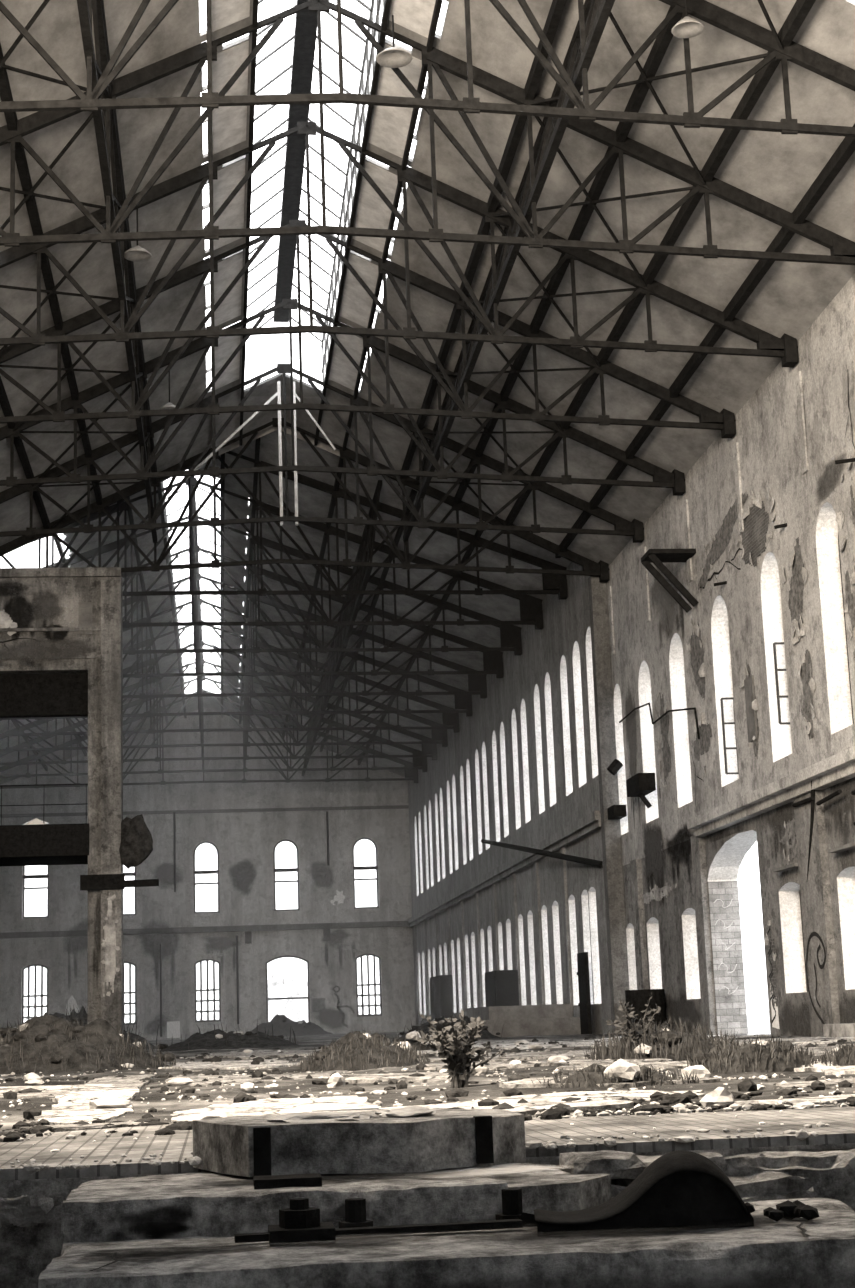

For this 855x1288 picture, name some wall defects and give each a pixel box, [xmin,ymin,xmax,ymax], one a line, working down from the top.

peeling [693,487,776,592]
peeling [0,610,18,636]
leakage [230,861,256,894]
leakage [311,863,332,887]